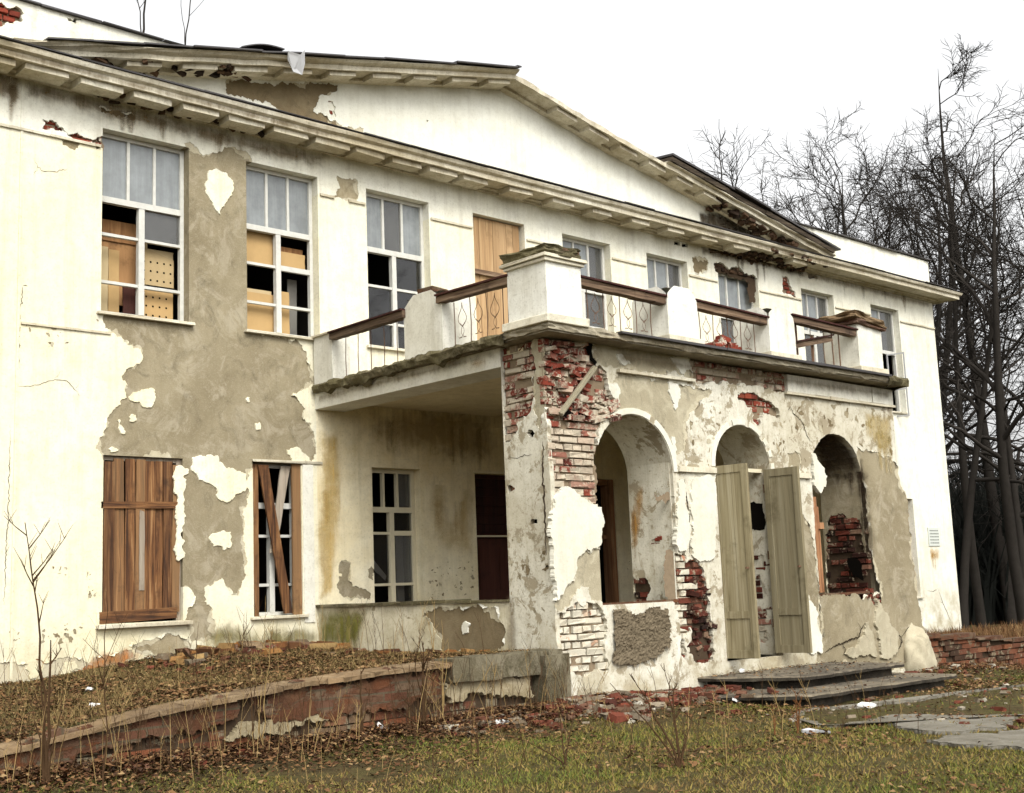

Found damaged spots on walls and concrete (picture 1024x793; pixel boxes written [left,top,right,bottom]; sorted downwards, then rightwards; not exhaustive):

spalling [97,94,191,120]
flaking render [139,59,363,132]
flaking render [335,176,359,201]
spalling [692,196,828,303]
flaking render [0,142,316,684]
leakage [321,439,337,590]
flaking render [502,337,927,677]
flaking render [337,560,374,601]
flaking render [423,562,519,651]
crack [825,621,867,653]